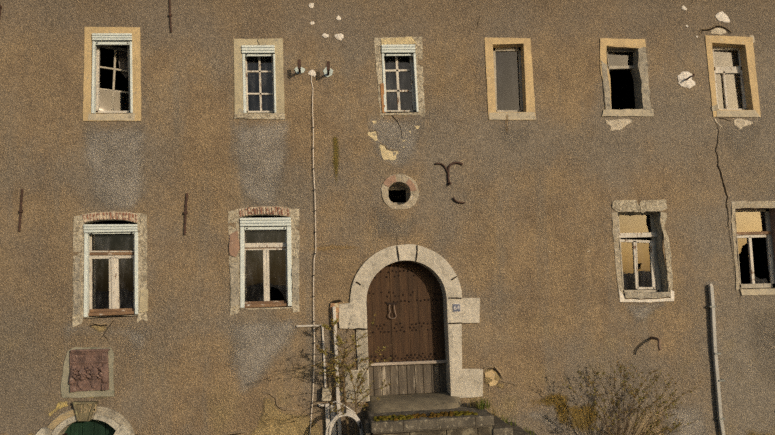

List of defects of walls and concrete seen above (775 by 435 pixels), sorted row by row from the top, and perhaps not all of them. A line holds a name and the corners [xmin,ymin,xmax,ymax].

flaking render [699,25,732,35]
flaking render [368,121,419,161]
flaking render [606,119,632,131]
flaking render [734,119,753,129]
water stain [88,132,141,207]
water stain [237,126,285,201]
crack [715,118,741,305]
flaking render [483,365,516,388]